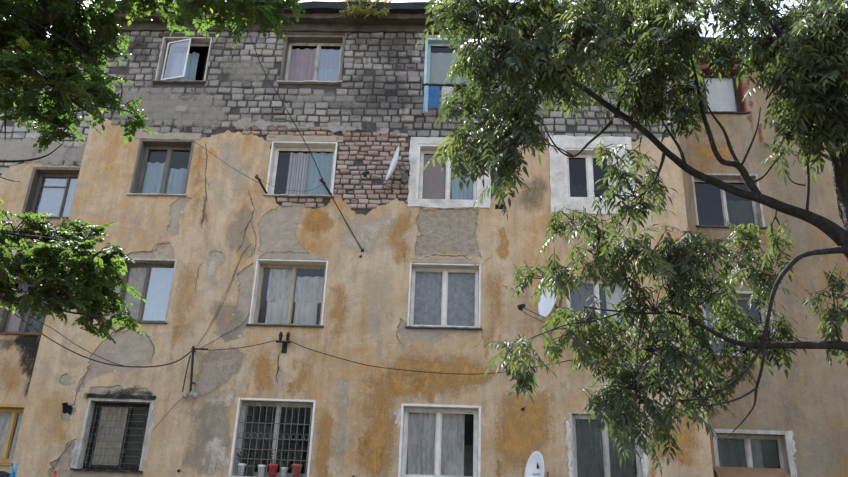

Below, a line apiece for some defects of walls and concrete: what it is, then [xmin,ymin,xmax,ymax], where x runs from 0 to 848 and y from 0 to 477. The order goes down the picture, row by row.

crack [201,144,210,228]
crack [208,190,324,328]
spalling [257,202,310,255]
spalling [411,207,481,259]
spalling [211,263,254,343]
spalling [45,329,158,477]
peeling [199,390,235,475]
peeling [564,412,573,477]
peeling [640,424,649,477]